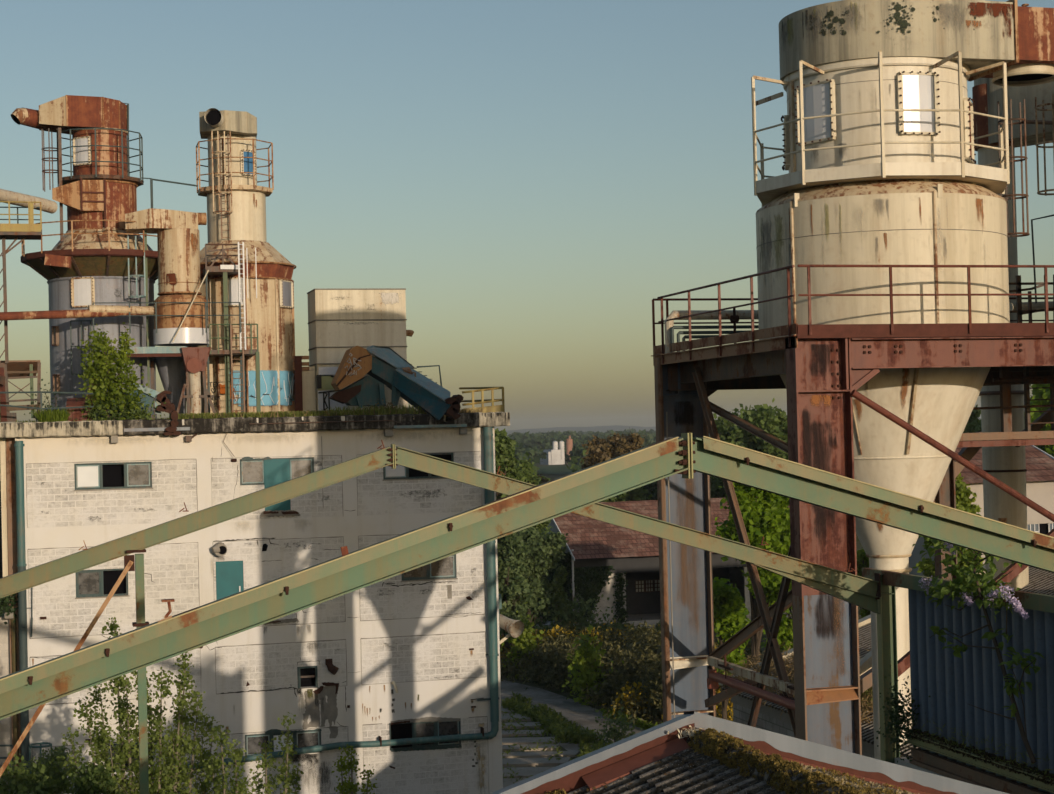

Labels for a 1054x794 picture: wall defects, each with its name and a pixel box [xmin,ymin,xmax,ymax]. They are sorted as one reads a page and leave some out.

rust [976,199,984,223]
rust [811,344,833,374]
rust [803,395,836,472]
rust [813,505,835,538]
rust [816,591,840,637]
spalling [302,682,339,738]